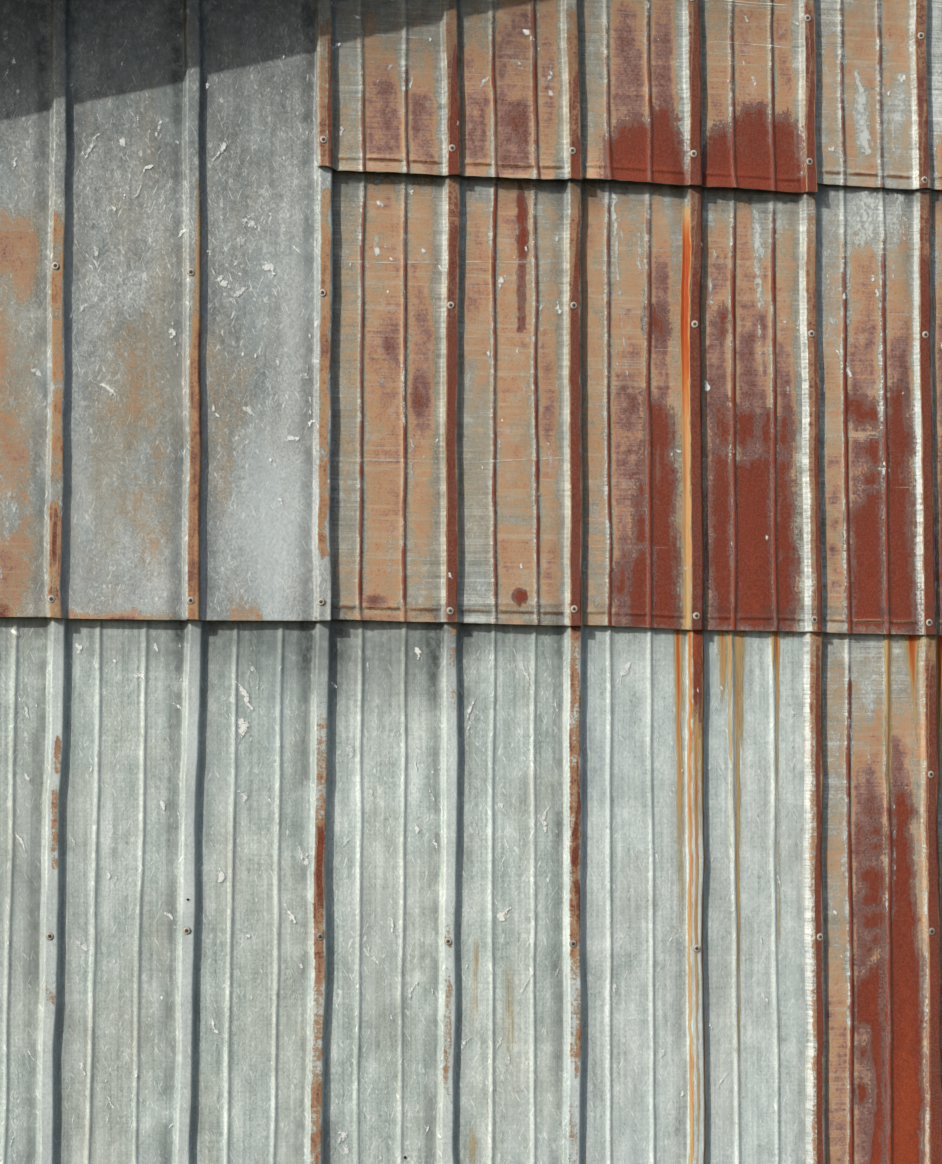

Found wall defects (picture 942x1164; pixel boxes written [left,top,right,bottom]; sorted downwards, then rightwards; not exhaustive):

corrosion [0,180,245,620]
corrosion [318,0,942,1164]
corrosion [310,718,328,1164]